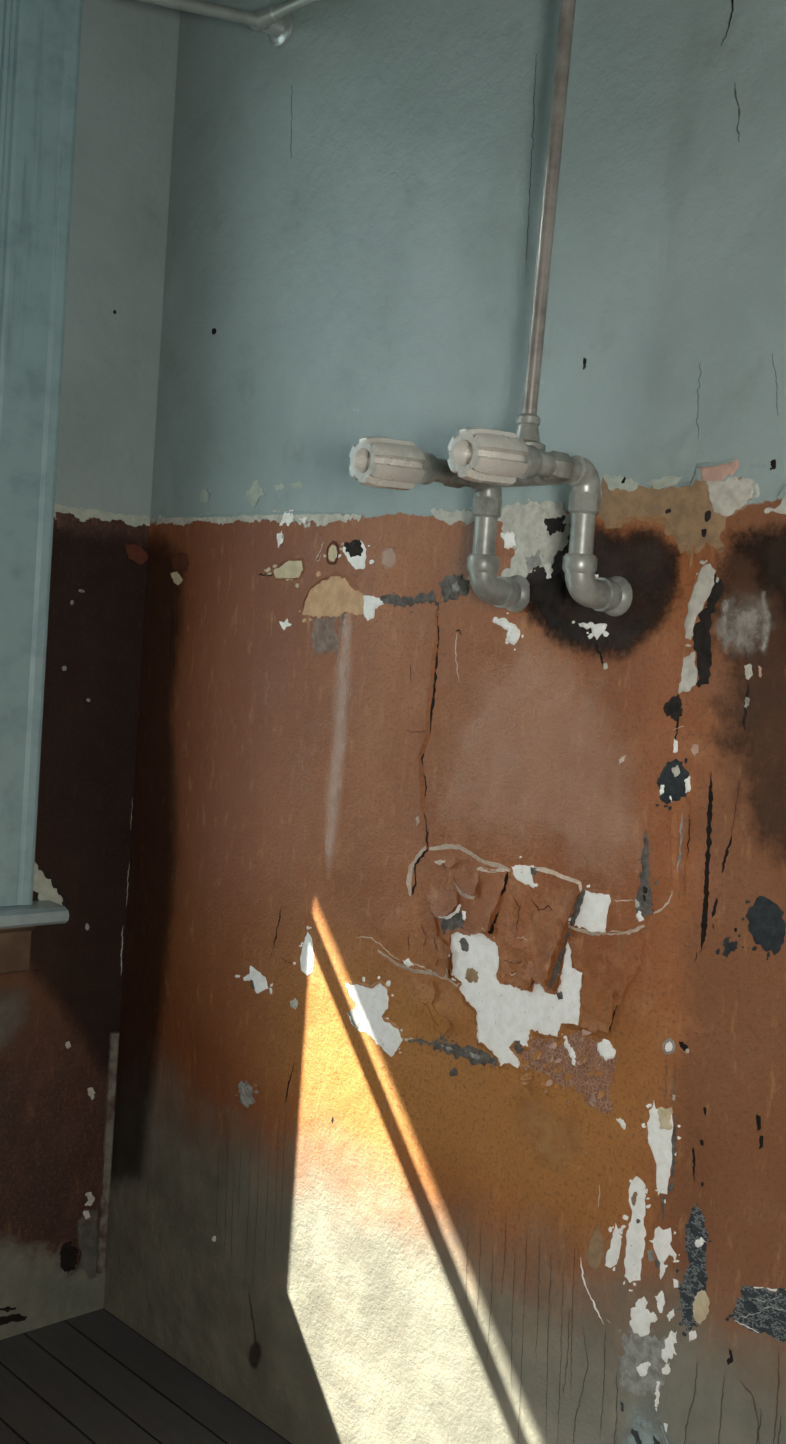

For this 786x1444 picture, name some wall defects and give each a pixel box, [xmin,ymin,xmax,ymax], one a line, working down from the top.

crack [721,0,734,45]
flaking render [54,479,384,659]
crack [406,605,511,896]
flaking render [492,612,524,651]
flaking render [497,499,609,639]
water stain [526,528,679,659]
peeling [598,456,786,811]
water stain [714,526,786,856]
peeling [235,966,273,994]
flaking render [345,976,405,1059]
peeling [716,896,786,960]
flaking render [408,830,712,1444]